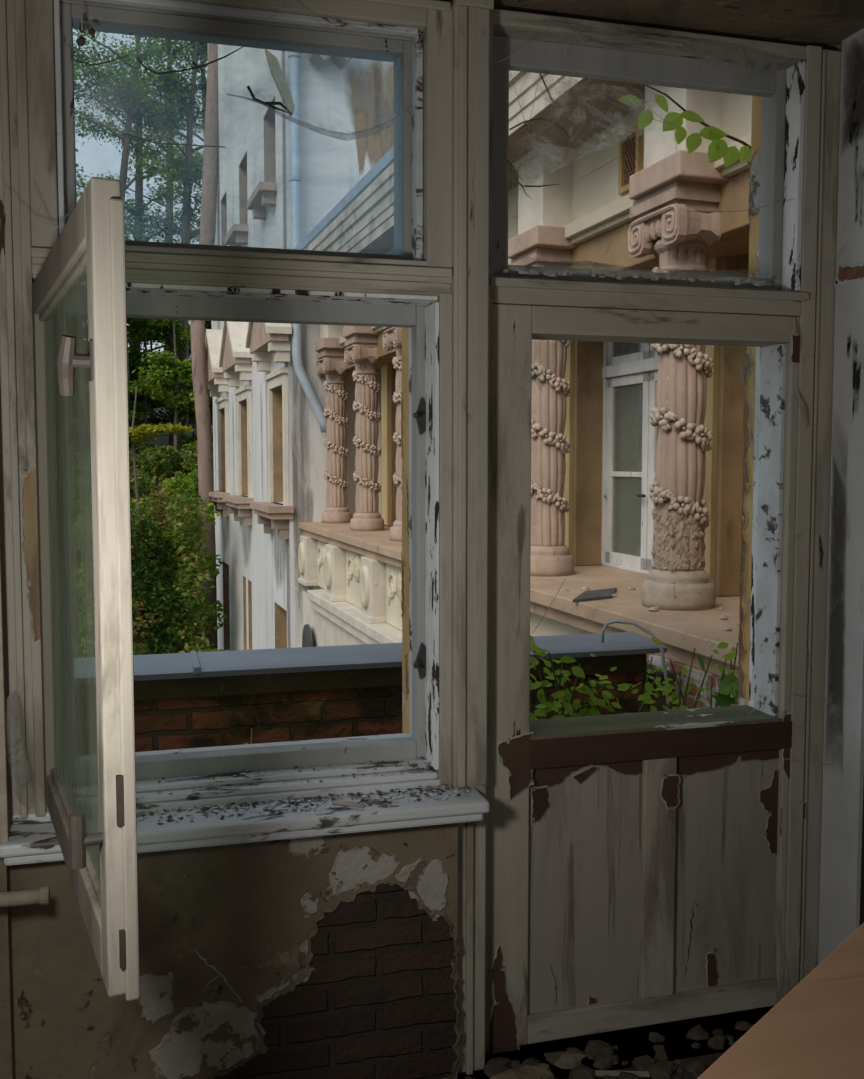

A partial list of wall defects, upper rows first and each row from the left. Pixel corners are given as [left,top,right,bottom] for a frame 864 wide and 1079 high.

peeling [126,283,439,792]
peeling [137,783,476,824]
peeling [497,732,643,826]
peeling [660,748,790,855]
spalling [138,836,463,1079]
peeling [486,944,520,1056]